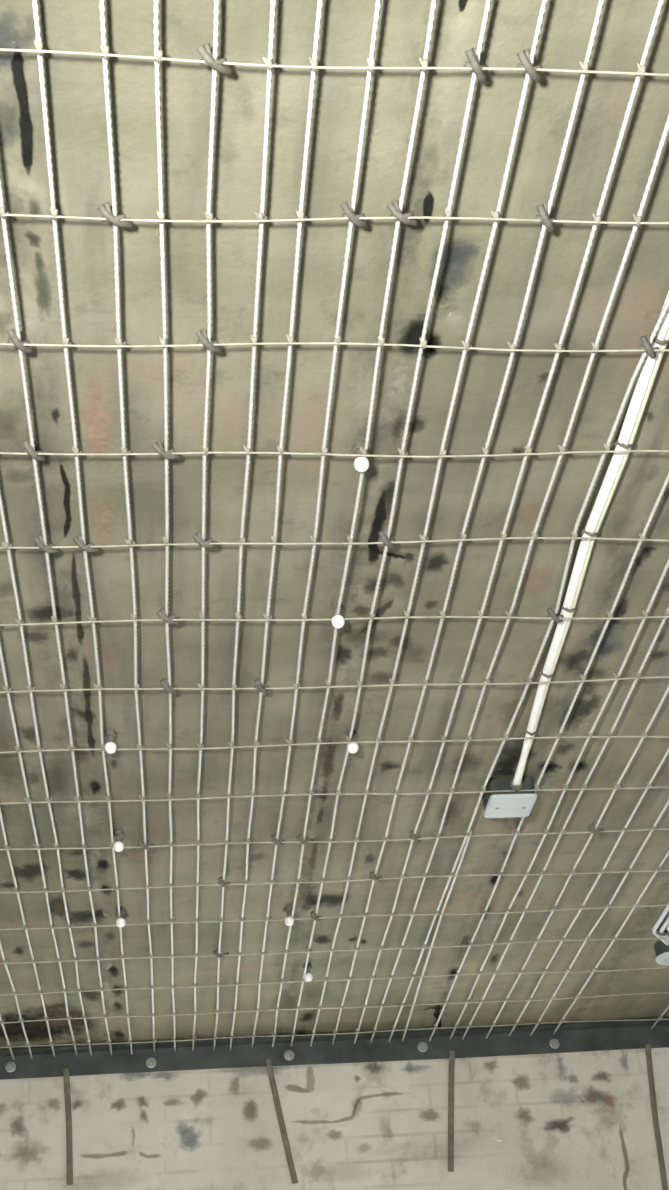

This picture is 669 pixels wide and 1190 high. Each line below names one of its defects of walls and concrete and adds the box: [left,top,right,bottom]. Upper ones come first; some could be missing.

damp [0,1004,88,1040]
crack [620,1130,629,1190]